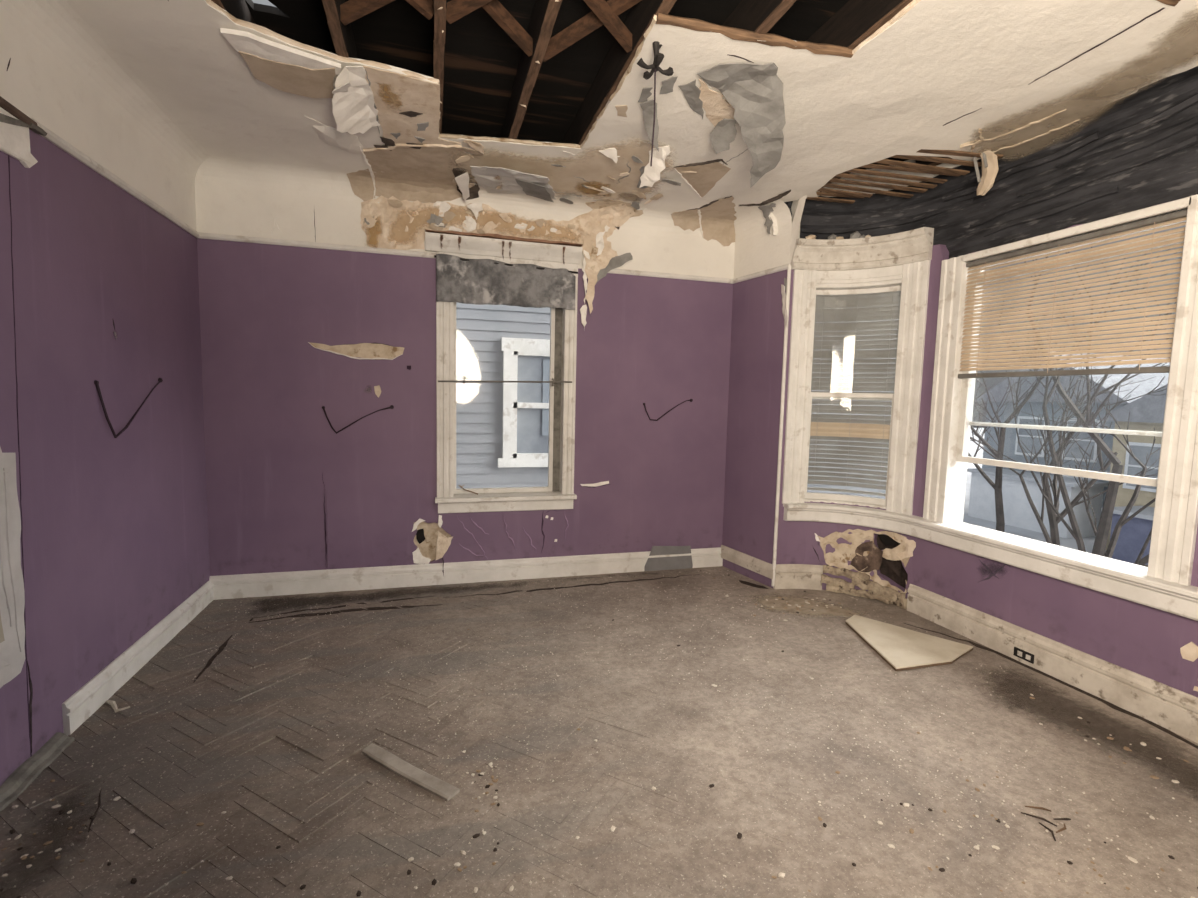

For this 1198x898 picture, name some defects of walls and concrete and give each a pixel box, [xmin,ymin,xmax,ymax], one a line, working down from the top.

spalling [220,28,395,146]
peeling [615,54,786,188]
water stain [960,106,1080,153]
flaking render [787,66,1198,259]
spalling [360,166,636,250]
spalling [308,342,411,370]
spalling [412,515,453,575]
spalling [813,529,916,593]
peeling [1180,642,1198,662]